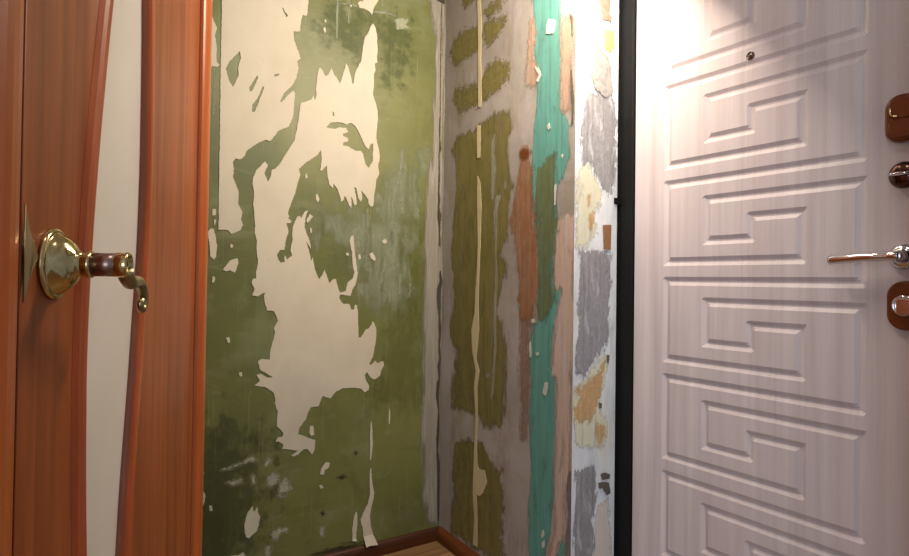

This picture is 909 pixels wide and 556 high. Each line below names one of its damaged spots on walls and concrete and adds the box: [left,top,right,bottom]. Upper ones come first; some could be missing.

peeling [211,18,219,67]
peeling [350,0,378,14]
peeling [546,19,556,34]
spalling [599,0,612,23]
spalling [591,47,613,98]
peeling [208,209,217,260]
peeling [223,258,238,273]
peeling [352,422,378,548]
spalling [598,473,611,495]
peeling [244,506,260,538]